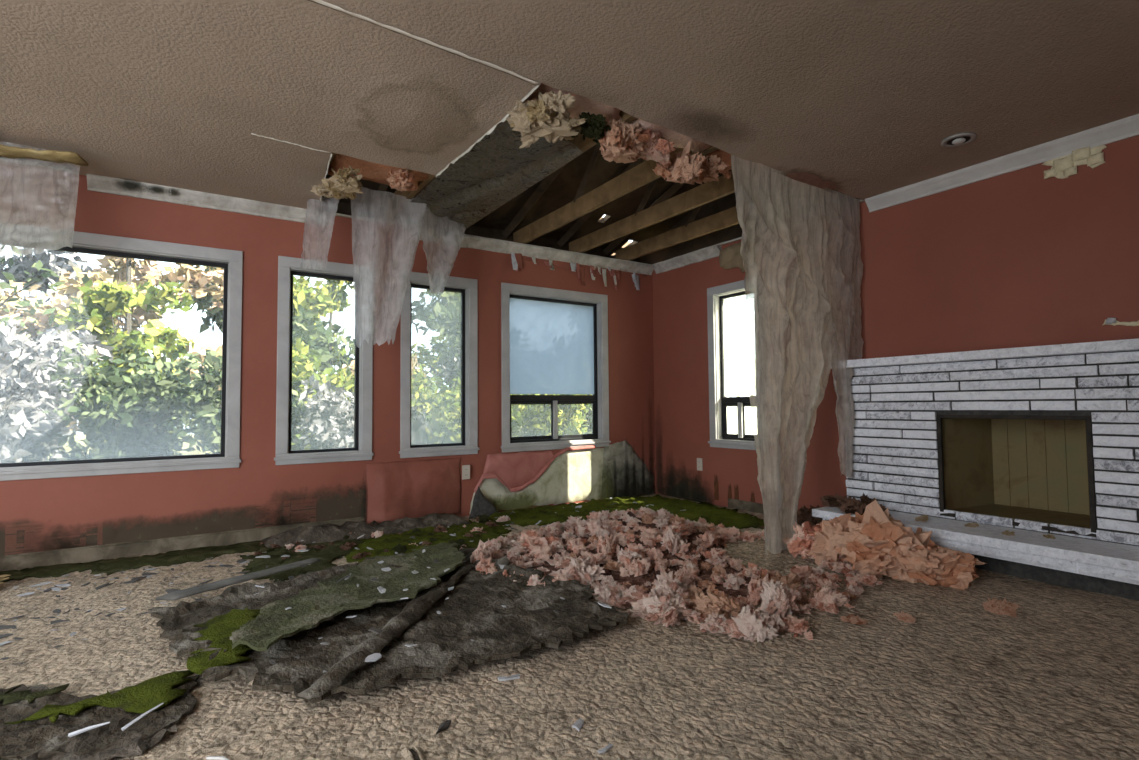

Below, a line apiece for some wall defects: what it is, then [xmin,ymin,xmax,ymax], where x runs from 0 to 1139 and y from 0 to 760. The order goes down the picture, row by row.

flaking render [1042,145,1107,179]
peeling [469,445,604,519]
mould [598,440,711,504]
leakage [0,488,366,556]